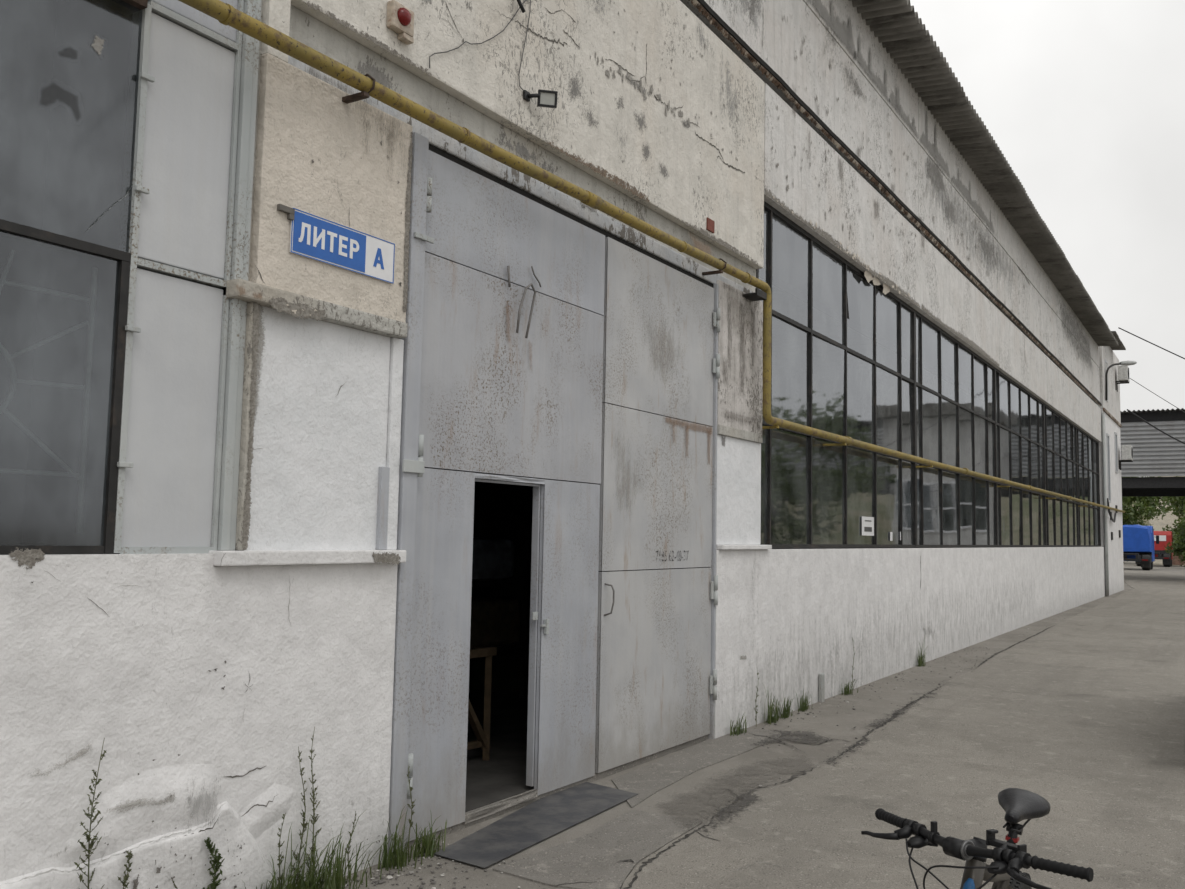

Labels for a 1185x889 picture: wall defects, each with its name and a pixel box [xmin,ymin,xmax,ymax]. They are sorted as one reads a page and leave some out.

crack [493,9,763,183]
leakage [724,305,755,392]
flaking render [9,547,45,583]
spalling [372,552,401,565]
crack [225,766,265,778]